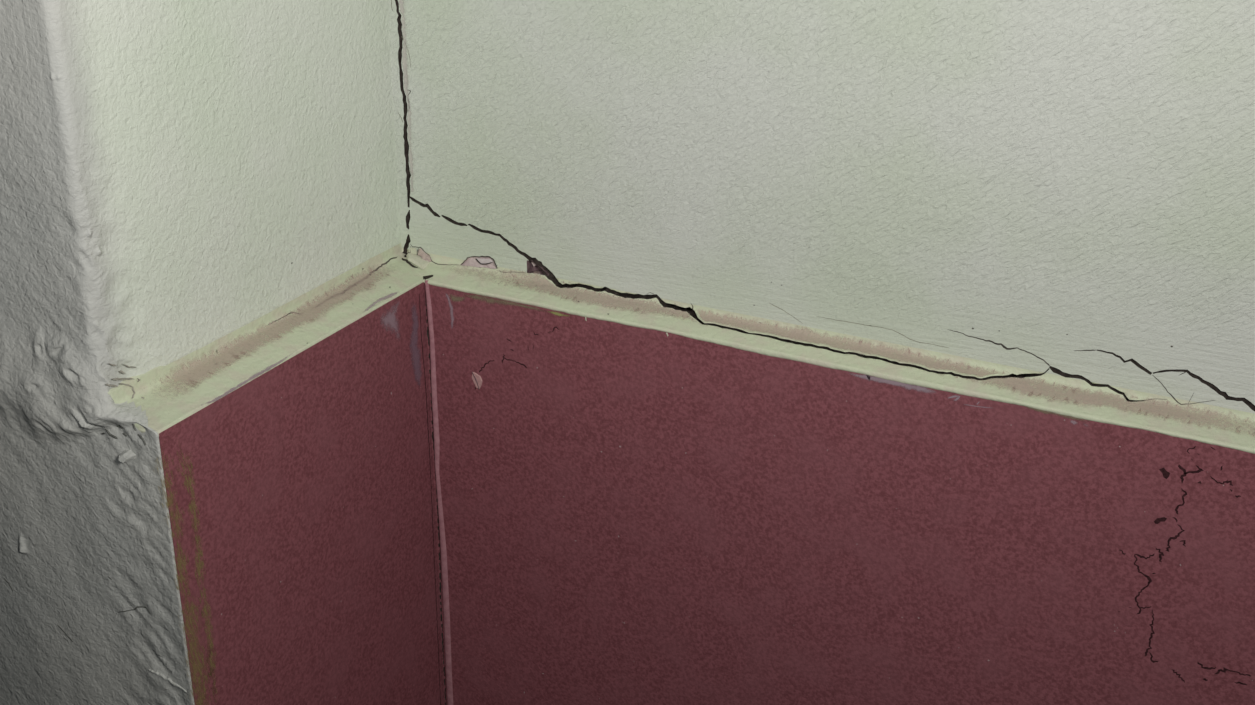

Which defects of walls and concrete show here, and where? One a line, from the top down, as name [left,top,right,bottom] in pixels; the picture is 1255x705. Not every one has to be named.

spalling [402,245,549,276]
crack [268,0,1255,705]